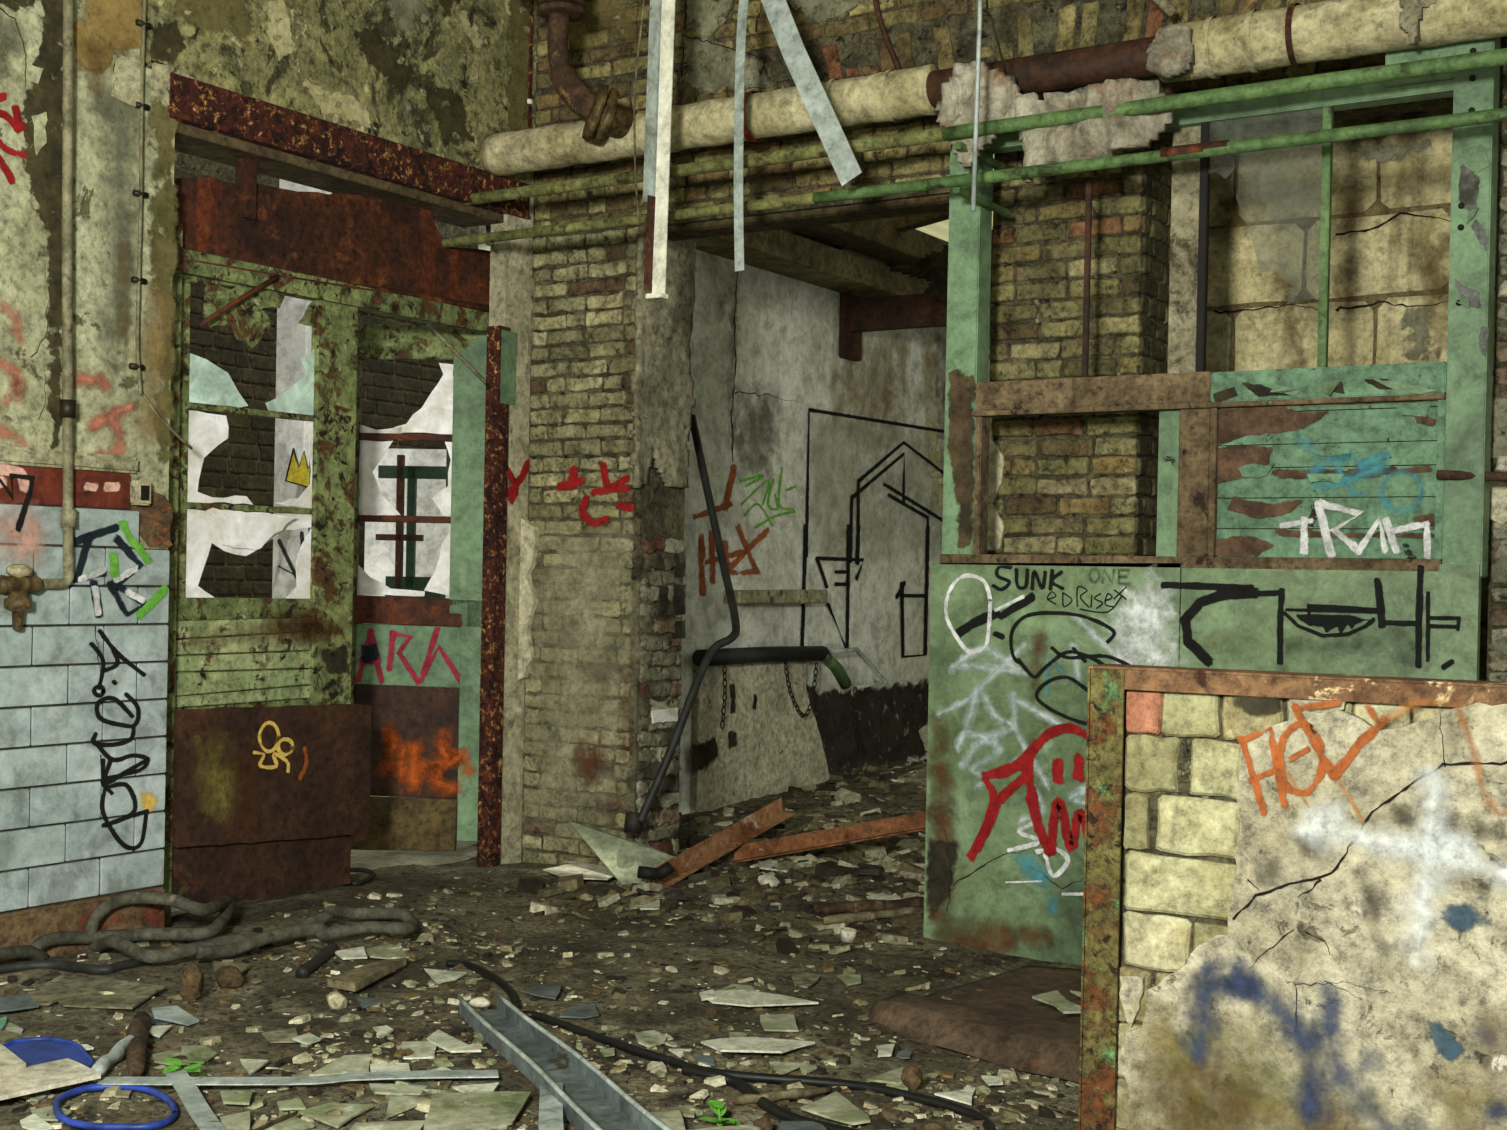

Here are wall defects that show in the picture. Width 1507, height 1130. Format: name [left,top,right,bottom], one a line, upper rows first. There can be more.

flaking render [111,0,297,107]
peeling [302,78,377,130]
peeling [354,0,488,147]
peeling [506,0,534,131]
peeling [1213,376,1436,557]
spalling [1234,696,1346,716]
peeling [1350,887,1373,923]
crack [1232,715,1507,1017]
spalling [1119,975,1144,1027]
peeling [1492,1055,1507,1072]